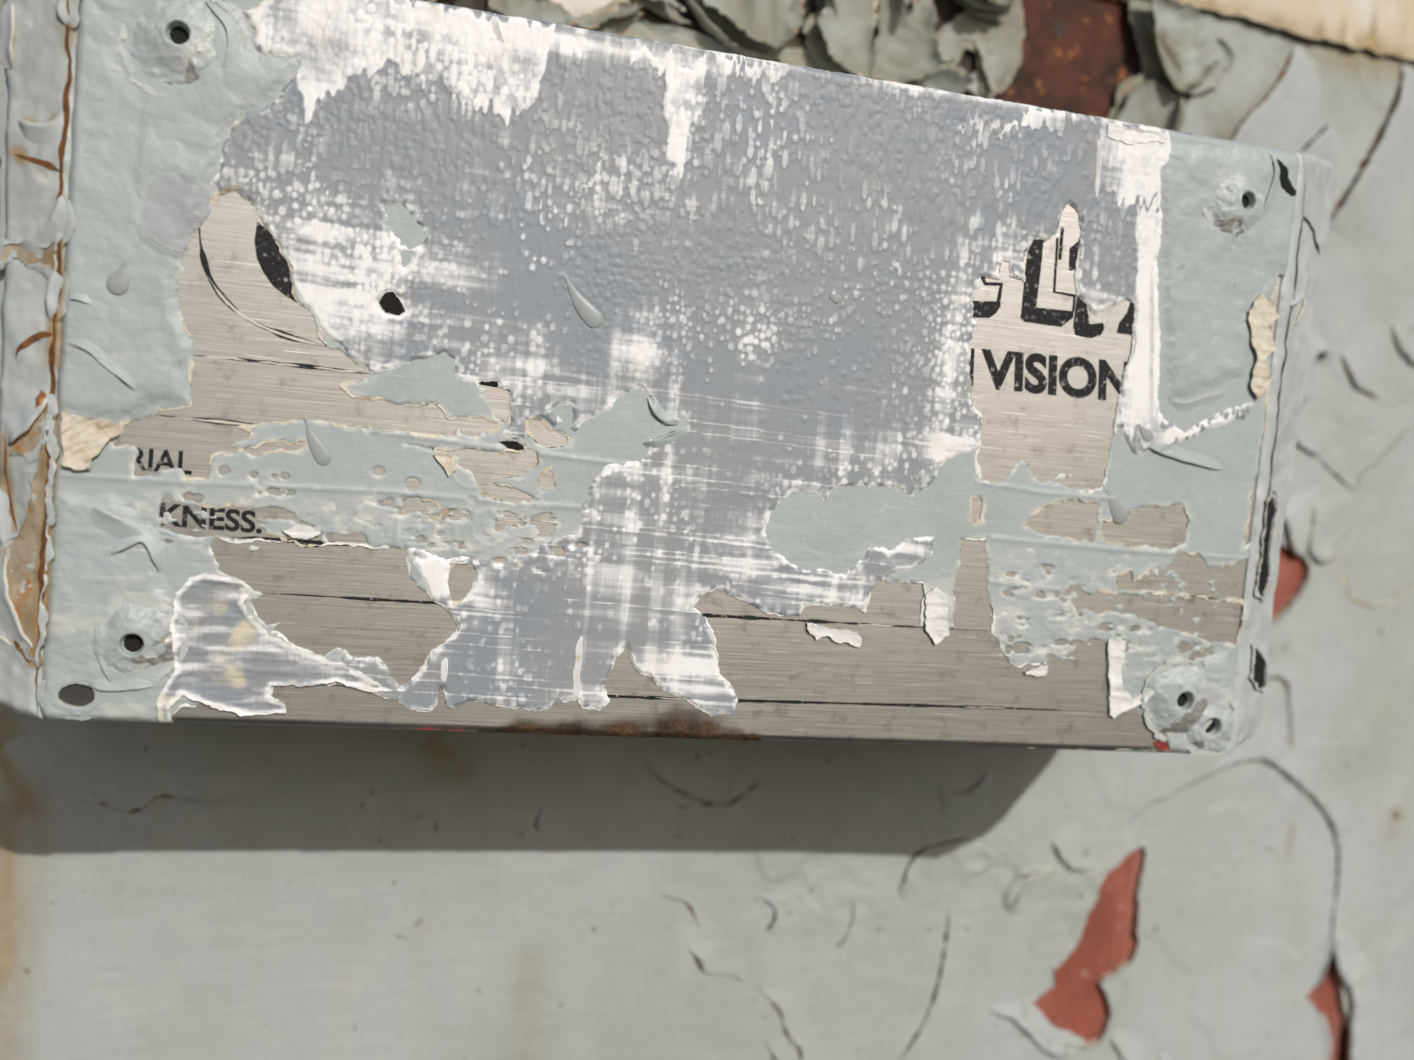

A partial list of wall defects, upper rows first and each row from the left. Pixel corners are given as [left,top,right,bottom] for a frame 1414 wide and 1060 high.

peeling [422,0,1235,130]
peeling [0,231,63,279]
crack [1231,40,1414,526]
peeling [114,189,1284,751]
peeling [1271,543,1312,626]
crack [688,942,826,1060]
crack [762,893,803,934]
crack [900,909,972,1060]
peeling [1018,840,1149,1050]
peeling [1305,938,1350,1060]